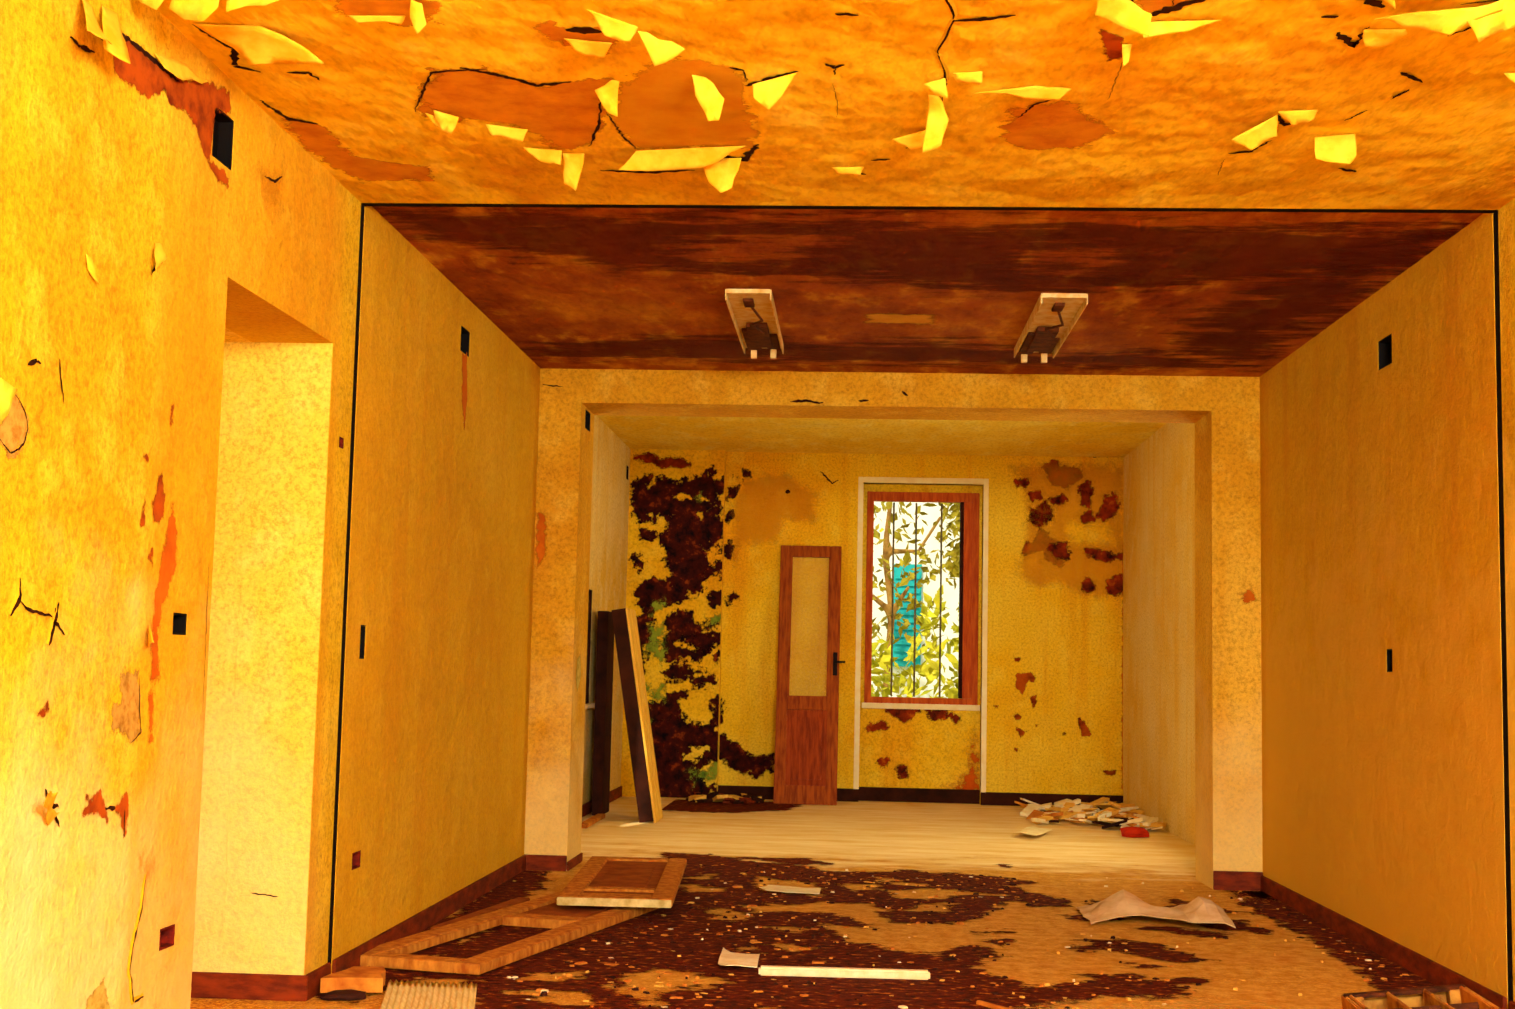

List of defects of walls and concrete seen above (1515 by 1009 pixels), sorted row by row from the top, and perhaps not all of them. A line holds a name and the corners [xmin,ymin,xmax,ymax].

peeling [70,0,231,188]
peeling [139,0,325,80]
peeling [415,9,798,193]
peeling [922,94,949,153]
crack [892,0,1016,151]
peeling [1095,0,1220,99]
peeling [1218,110,1357,174]
peeling [1321,0,1515,48]
crack [8,578,65,646]
corrosion [148,508,177,743]
corrosion [953,745,979,790]
peeling [82,789,129,837]